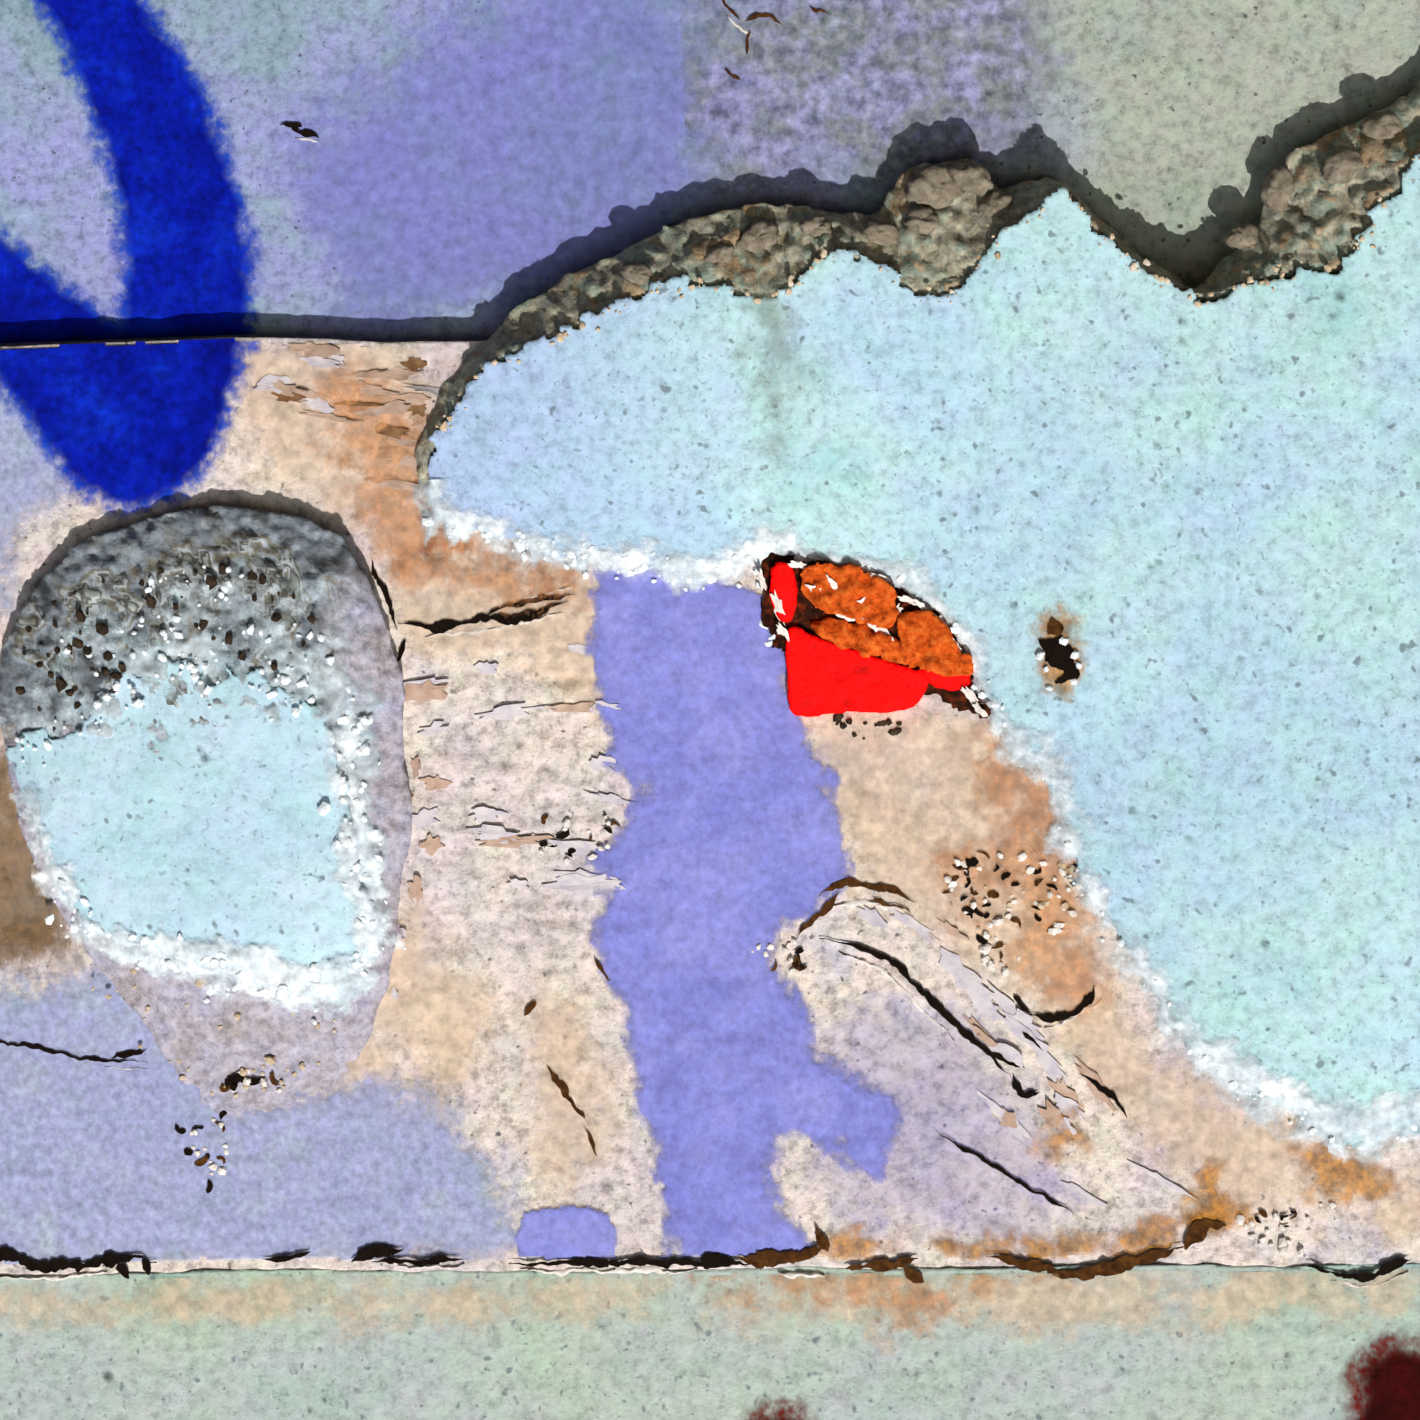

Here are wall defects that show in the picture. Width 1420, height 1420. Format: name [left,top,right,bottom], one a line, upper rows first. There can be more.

spalling [254,80,1420,1160]
spalling [0,506,452,1193]
crack [795,877,1101,1099]
crack [0,1040,148,1070]
crack [937,1131,1074,1215]
peeling [1129,1161,1199,1201]
crack [0,1247,157,1281]
crack [351,1245,468,1269]
crack [508,1226,924,1283]
crack [986,1219,1226,1281]
spalling [1235,1202,1336,1256]
crack [1308,1257,1410,1288]